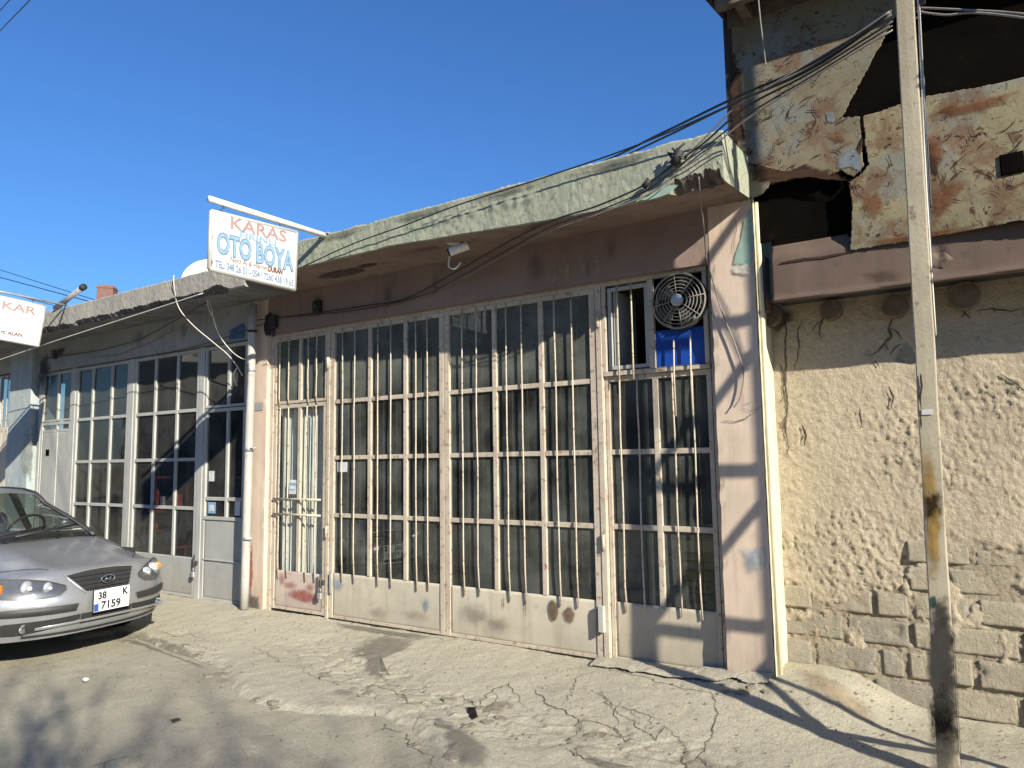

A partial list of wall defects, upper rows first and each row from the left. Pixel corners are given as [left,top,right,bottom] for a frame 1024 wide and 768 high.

corrosion [729,0,909,250]
corrosion [920,77,1024,237]
crack [962,308,1024,320]
crack [870,319,923,428]
corrosion [924,463,941,561]
damp [549,600,574,623]
flaking render [784,541,932,710]
flaking render [947,543,1024,725]
crack [367,683,688,768]